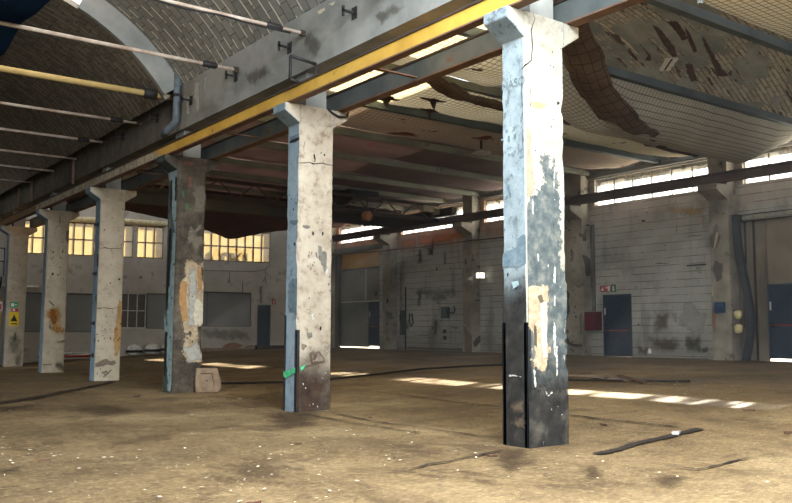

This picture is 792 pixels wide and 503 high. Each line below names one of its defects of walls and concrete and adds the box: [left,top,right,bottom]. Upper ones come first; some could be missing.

flaking render [652,21,730,82]
spalling [164,170,204,392]
peeling [501,120,591,385]
corrosion [48,309,63,332]
water stain [638,338,708,359]